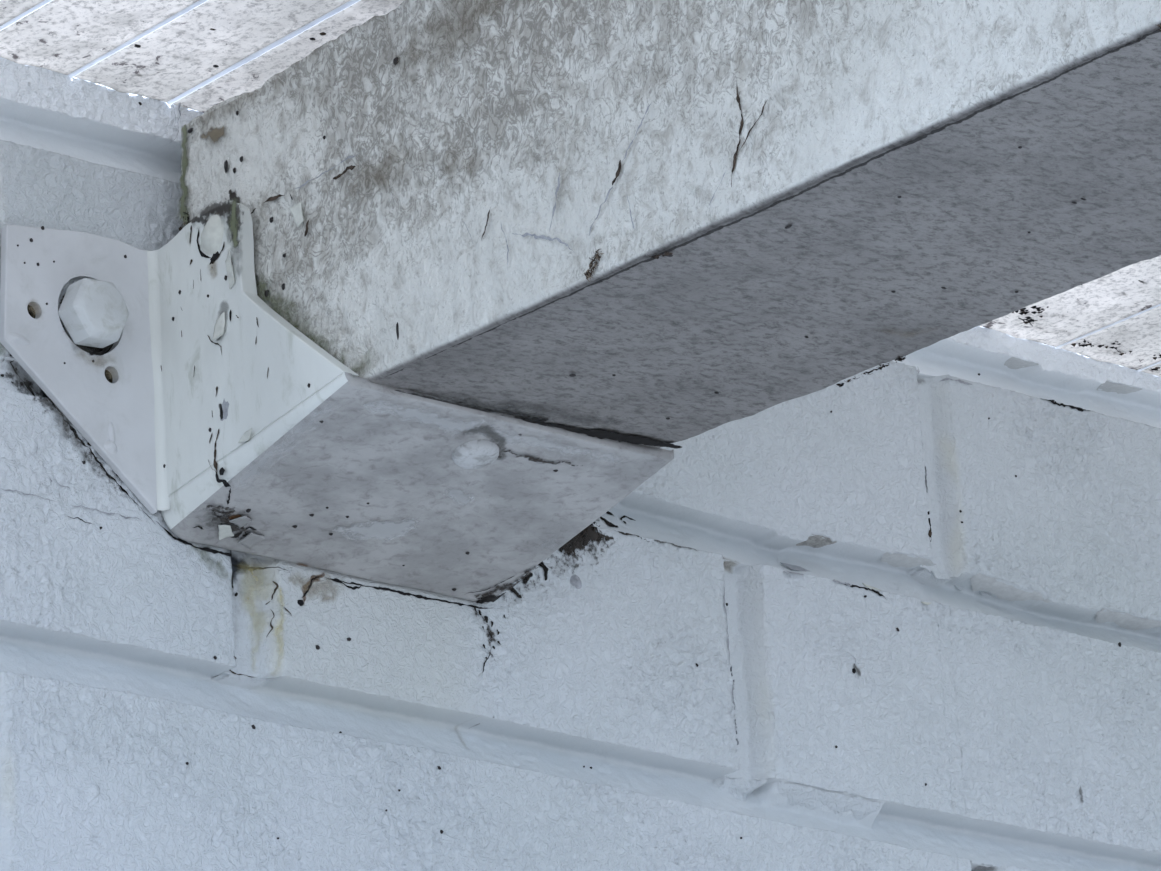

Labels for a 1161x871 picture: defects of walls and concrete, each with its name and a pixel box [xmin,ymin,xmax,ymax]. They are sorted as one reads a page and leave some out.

crack [709,81,768,205]
peeling [214,509,265,549]
water stain [325,511,695,674]